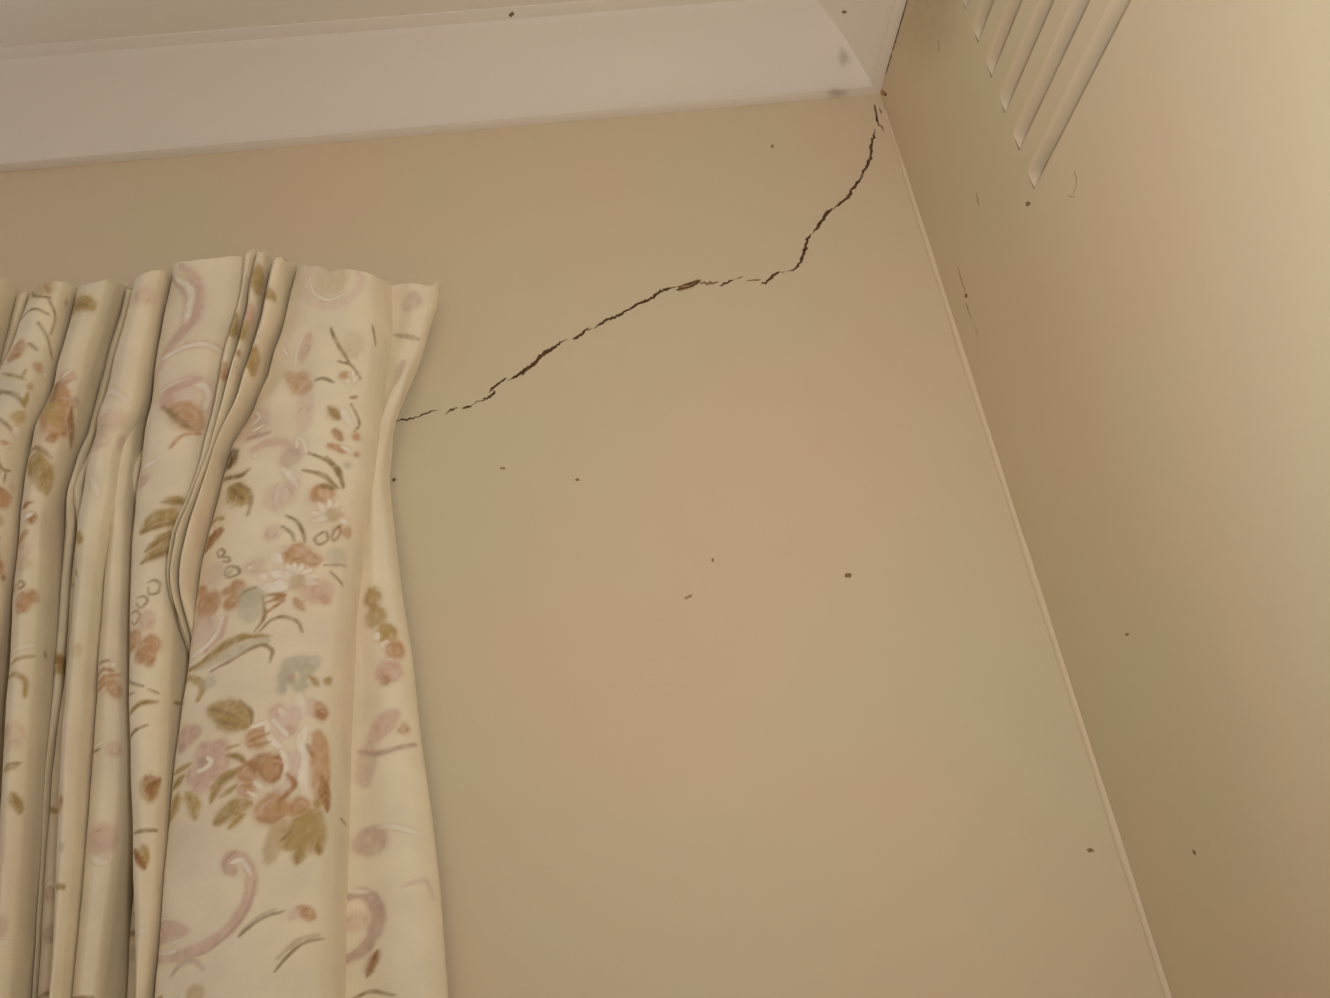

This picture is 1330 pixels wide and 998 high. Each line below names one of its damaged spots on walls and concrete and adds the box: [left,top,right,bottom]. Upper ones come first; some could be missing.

crack [397,1,907,421]